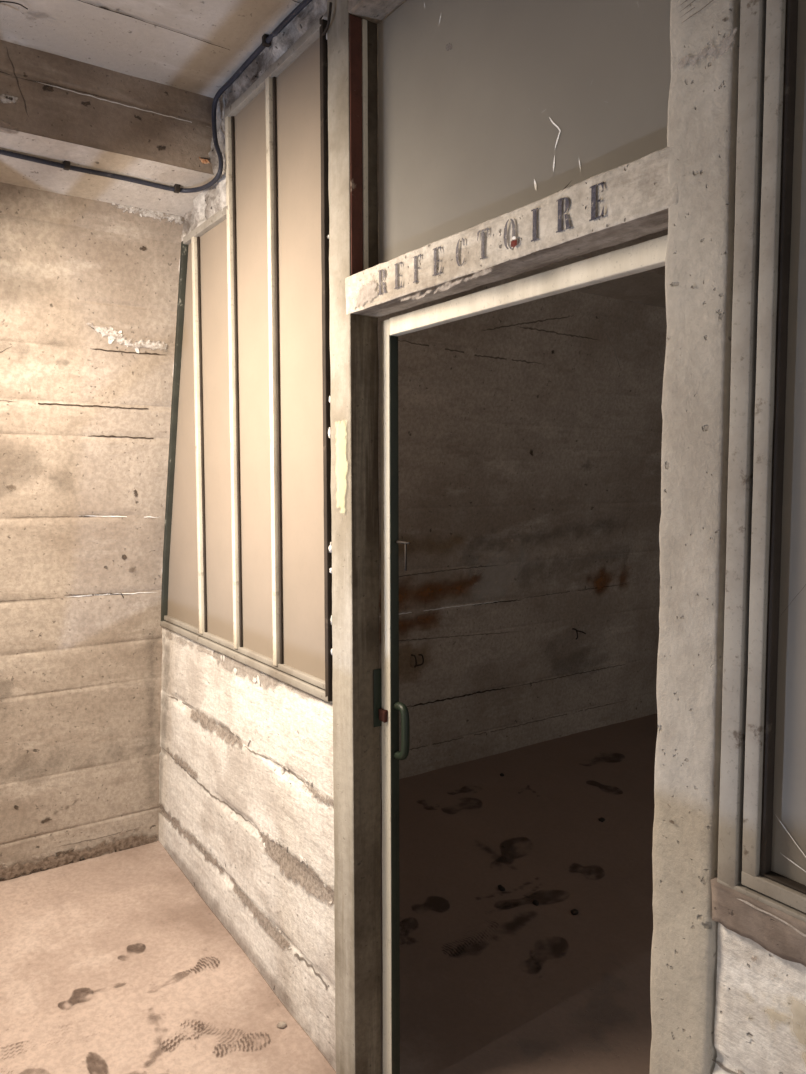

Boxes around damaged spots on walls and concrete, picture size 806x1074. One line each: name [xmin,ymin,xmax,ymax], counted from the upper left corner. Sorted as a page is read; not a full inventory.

rust [399,576,479,633]
spalling [0,826,157,881]